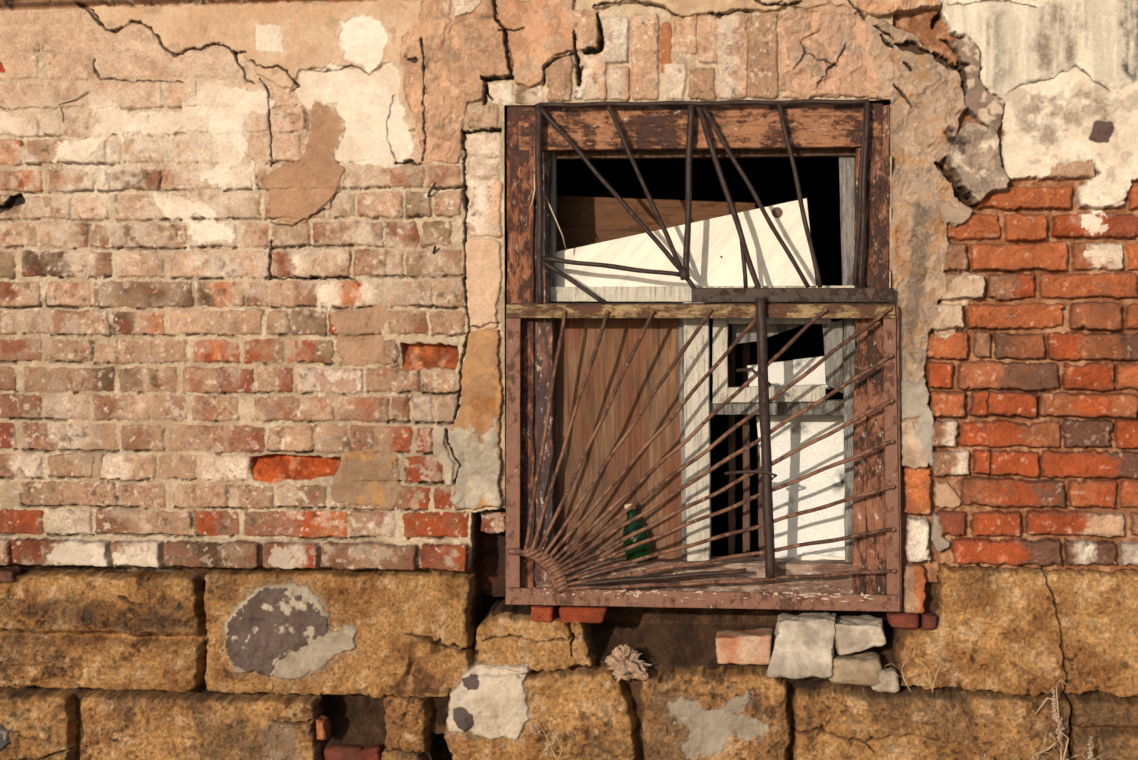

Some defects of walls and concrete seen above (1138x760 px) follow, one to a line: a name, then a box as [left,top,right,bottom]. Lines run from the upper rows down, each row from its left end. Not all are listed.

peeling [0,105,41,145]
crack [76,2,371,165]
crack [386,38,427,166]
crack [543,0,803,87]
crack [793,29,847,91]
crack [848,0,1038,109]
spalling [0,193,26,214]
peeling [150,191,238,246]
crack [446,0,522,485]
crack [934,162,980,210]
flaking render [592,0,1138,613]
crack [406,623,580,658]